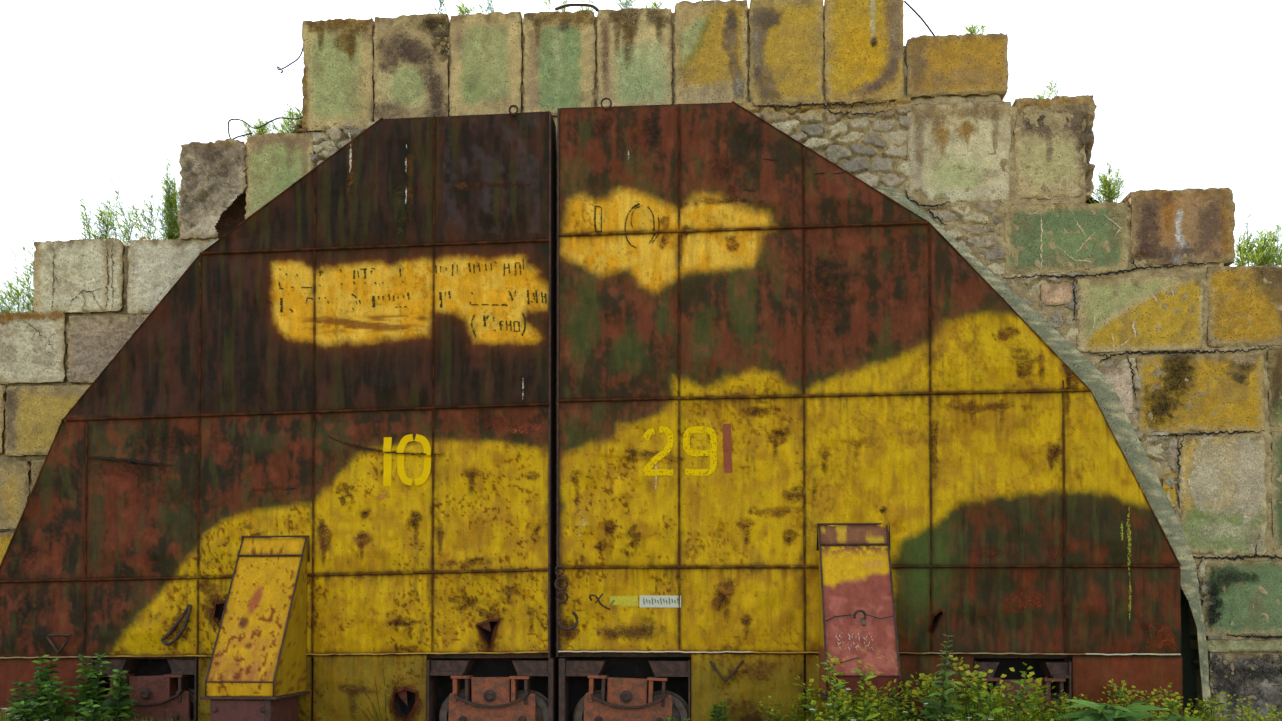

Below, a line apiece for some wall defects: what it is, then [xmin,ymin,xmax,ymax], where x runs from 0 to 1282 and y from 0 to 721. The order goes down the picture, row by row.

damp [378,35,446,116]
spalling [181,142,247,228]
rust [993,327,1045,377]
rust [950,400,1026,421]
damp [1143,355,1192,428]
rust [769,428,790,455]
rust [318,521,331,561]
rust [355,511,371,553]
rust [596,521,641,556]
rust [738,486,815,542]
rust [602,617,656,639]
rust [713,579,752,634]